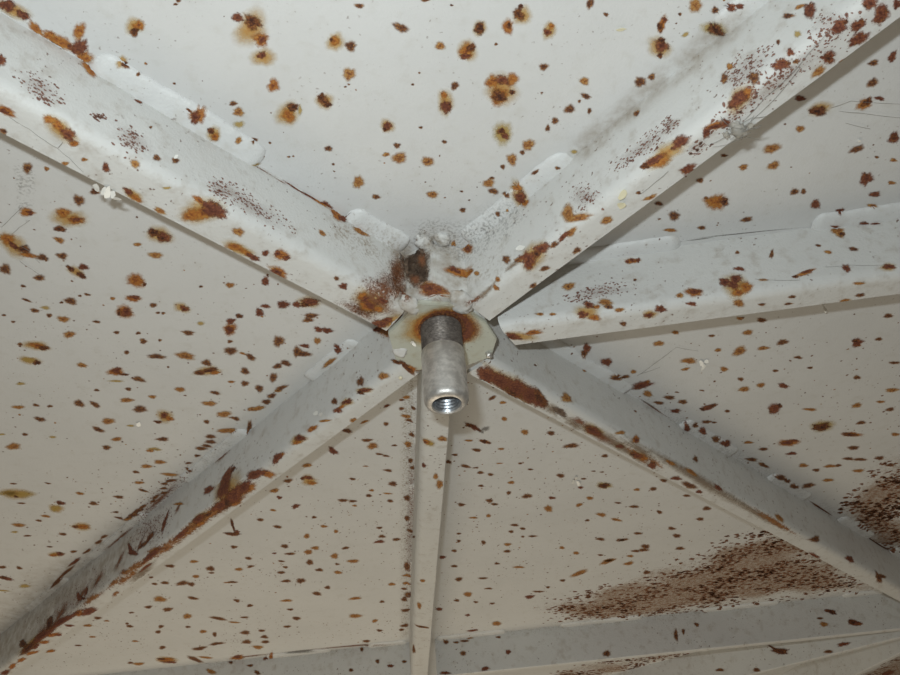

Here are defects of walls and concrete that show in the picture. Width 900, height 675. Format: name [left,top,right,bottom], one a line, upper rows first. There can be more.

rust [0,0,96,76]
rust [231,12,272,64]
rust [485,74,518,105]
rust [640,135,691,169]
rust [0,189,99,282]
rust [183,196,227,221]
rust [502,204,589,271]
rust [345,248,449,338]
rust [468,358,738,521]
rust [741,385,900,553]
rust [0,391,300,675]
rust [525,504,865,624]